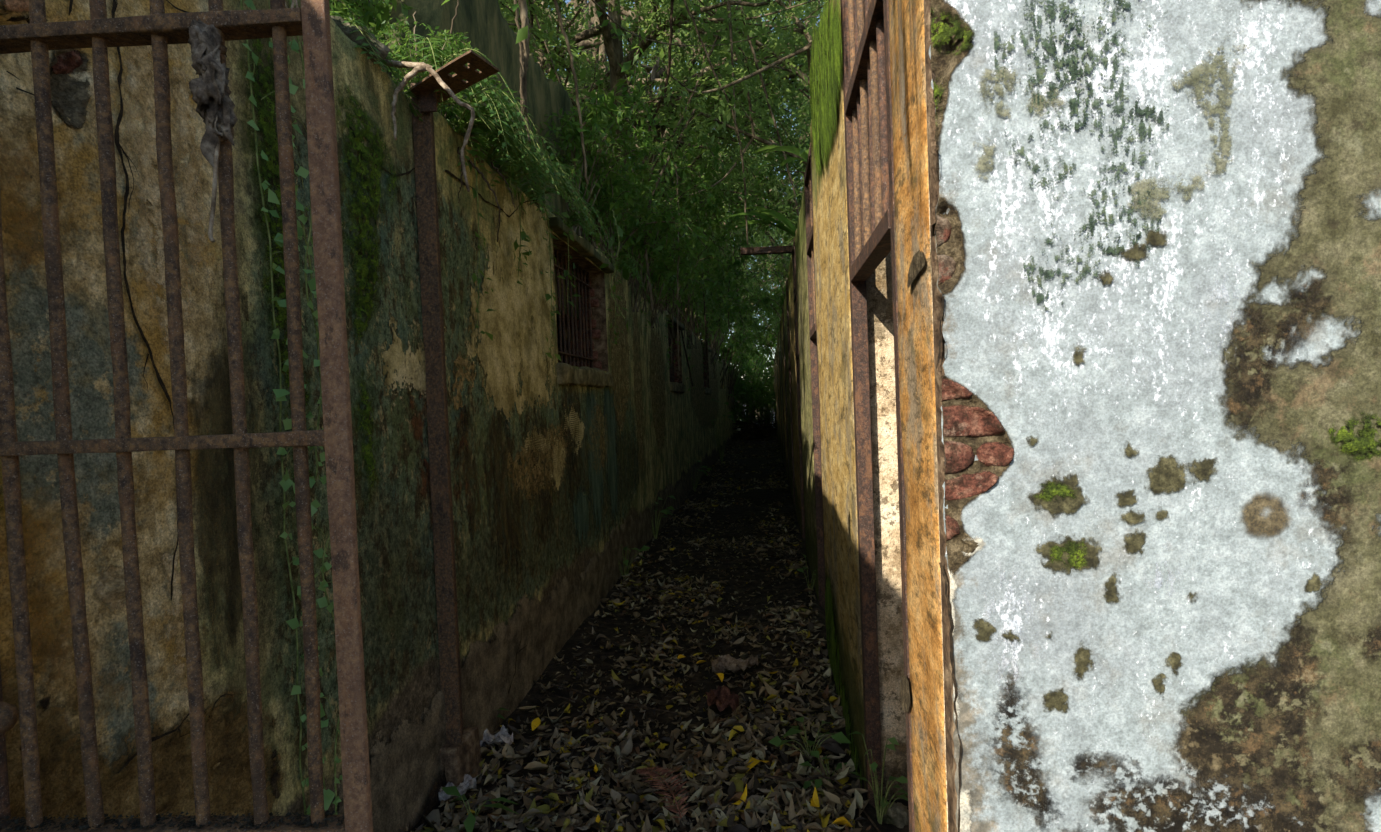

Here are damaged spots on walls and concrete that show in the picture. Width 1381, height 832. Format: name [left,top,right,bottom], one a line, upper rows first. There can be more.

crack [6,71,83,114]
spalling [50,48,97,129]
crack [111,0,174,427]
peeling [124,45,207,348]
spalling [907,196,966,295]
crack [170,524,178,601]
leakage [457,384,619,585]
spalling [941,375,1014,635]
peeling [1178,0,1381,832]
peeling [960,790,972,832]